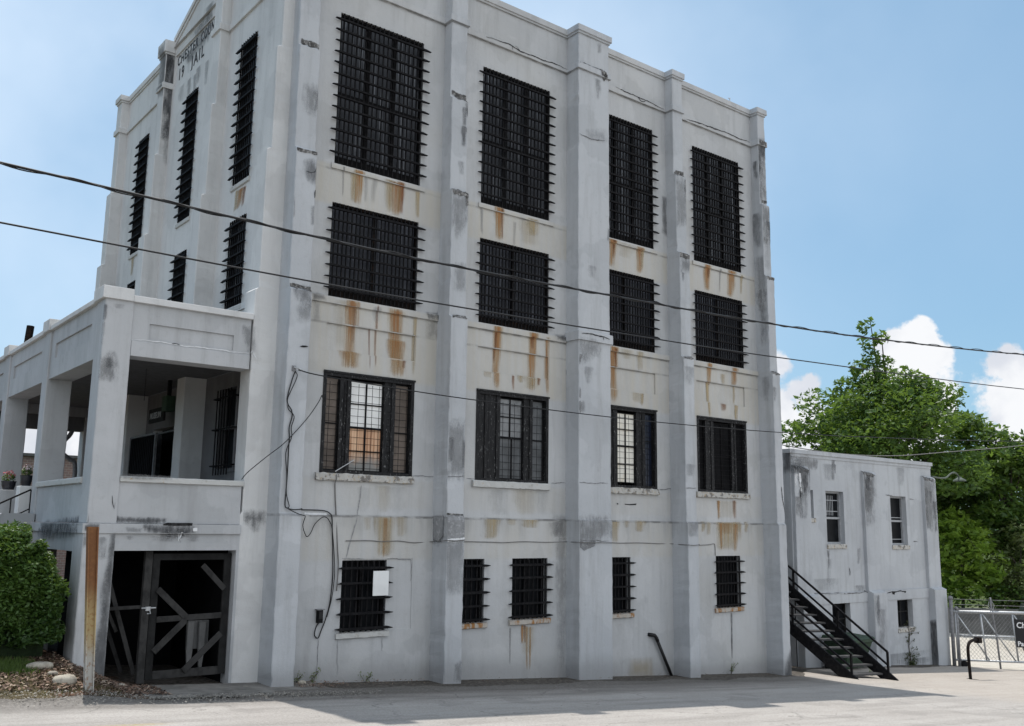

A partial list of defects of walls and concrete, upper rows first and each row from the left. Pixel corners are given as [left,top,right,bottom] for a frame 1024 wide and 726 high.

crack [488,37,662,109]
corrosion [344,167,363,201]
corrosion [389,181,420,215]
corrosion [495,207,504,236]
corrosion [609,239,617,265]
corrosion [342,300,359,366]
corrosion [377,307,417,373]
corrosion [493,326,502,384]
corrosion [512,332,548,385]
corrosion [610,346,618,397]
water stain [784,453,816,508]
corrosion [717,501,738,548]